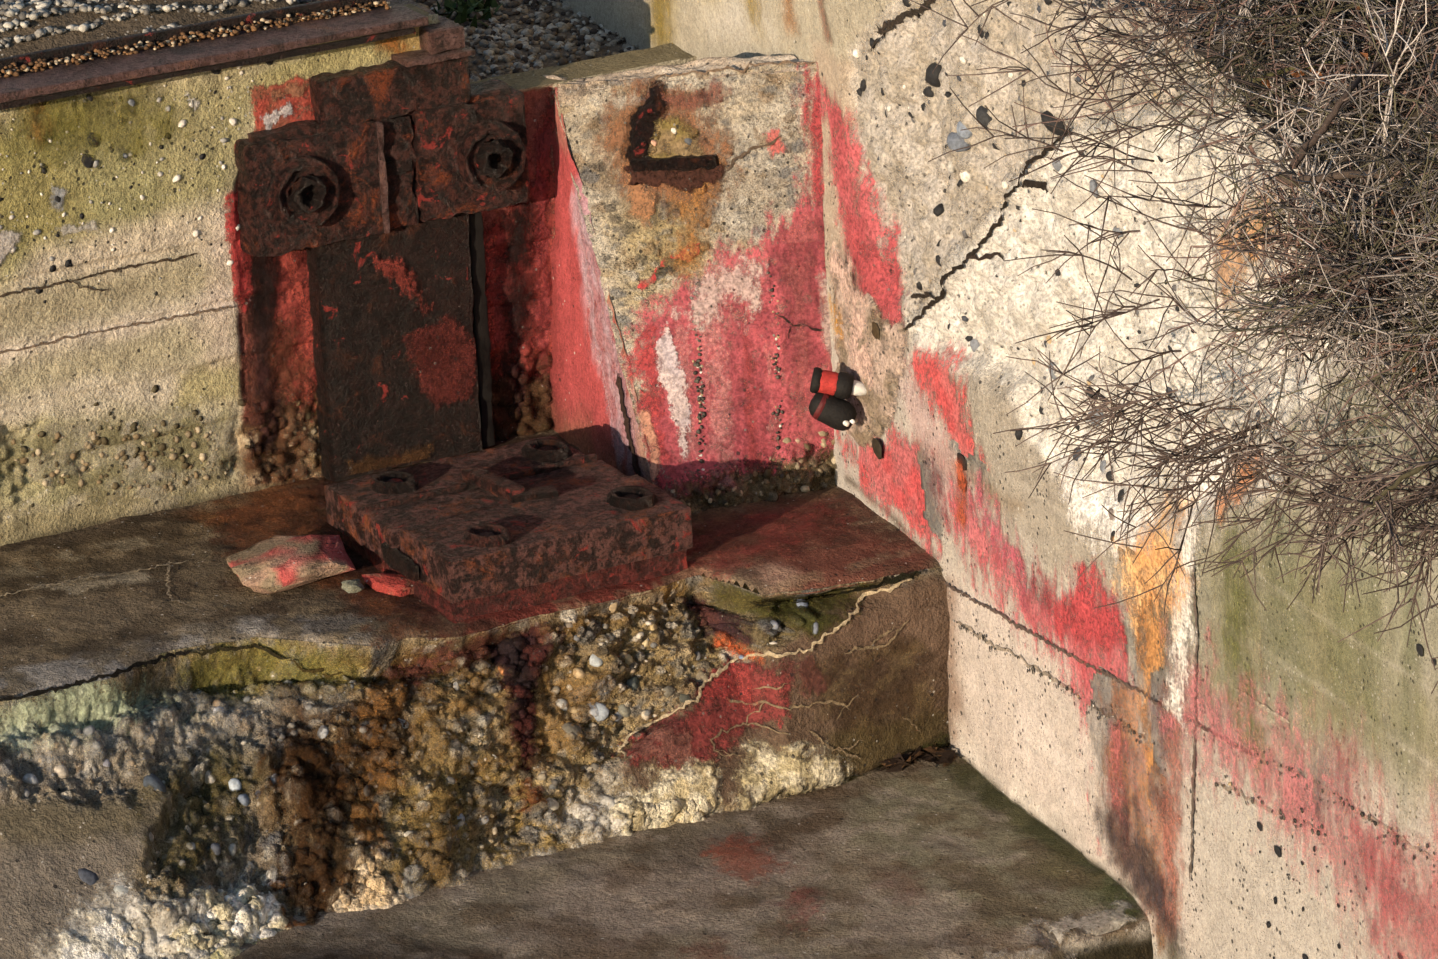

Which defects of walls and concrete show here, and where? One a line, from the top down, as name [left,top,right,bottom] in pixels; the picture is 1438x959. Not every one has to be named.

crack [871,0,934,52]
corrosion [492,203,552,441]
corrosion [597,78,730,268]
crack [903,128,1071,332]
crack [0,560,194,607]
crack [0,643,340,702]
crack [618,546,1253,879]
damp [1095,799,1177,950]